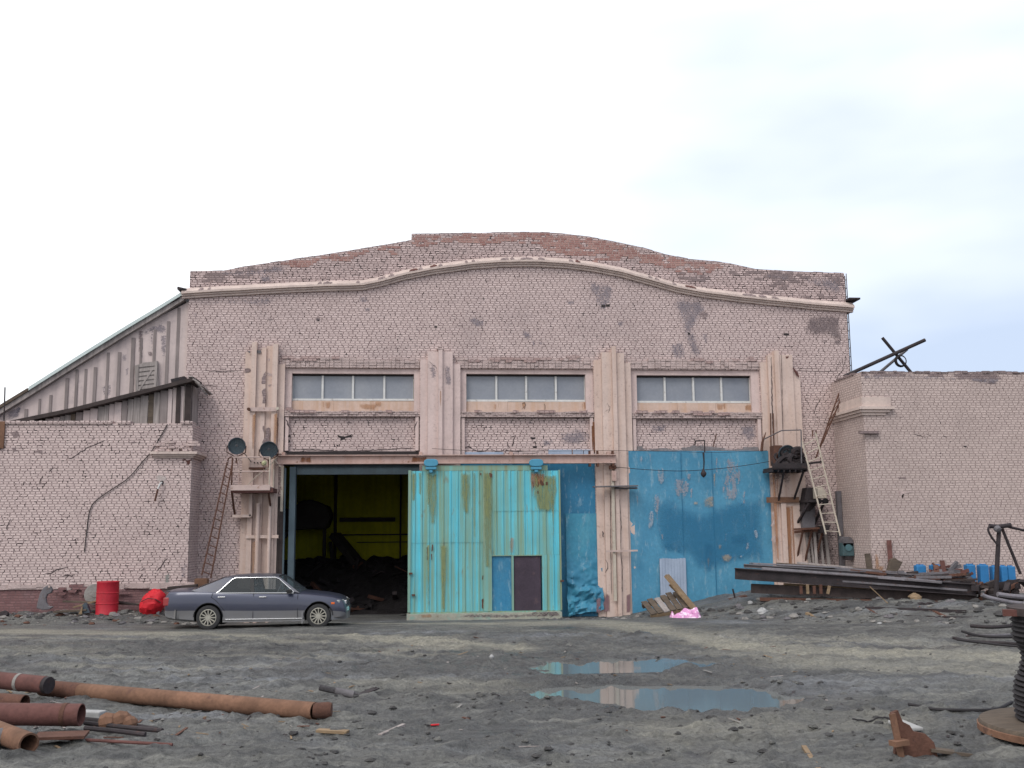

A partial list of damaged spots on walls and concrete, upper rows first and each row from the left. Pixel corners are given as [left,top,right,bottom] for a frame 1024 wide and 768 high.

peeling [203,232,811,299]
peeling [803,274,844,300]
damp [807,316,840,343]
corrosion [413,473,436,522]
corrosion [462,473,491,566]
corrosion [531,473,556,532]
peeling [637,458,745,528]
corrosion [427,545,446,609]